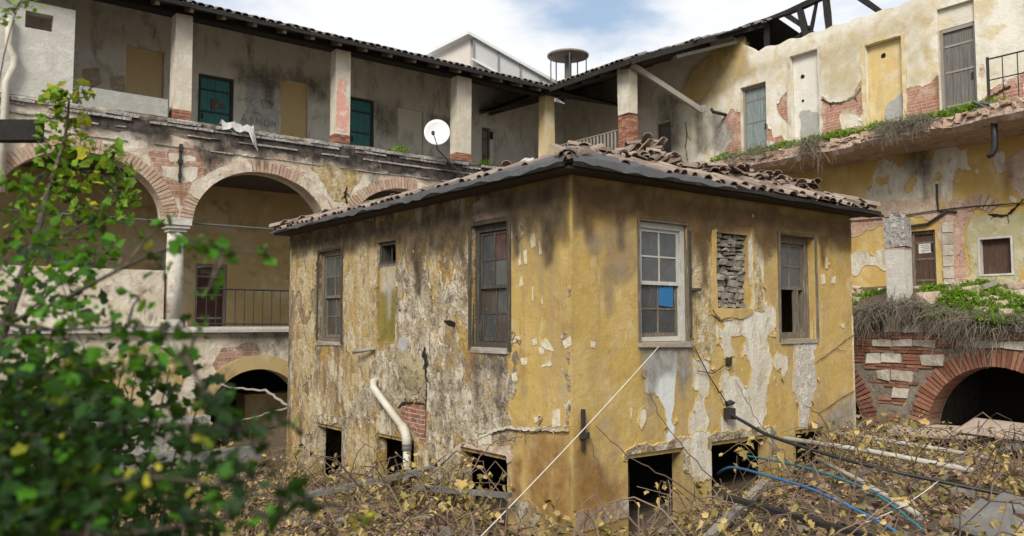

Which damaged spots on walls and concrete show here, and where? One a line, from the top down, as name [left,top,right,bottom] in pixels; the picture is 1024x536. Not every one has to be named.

flaking render [96,118,221,206]
flaking render [230,69,453,203]
water stain [290,179,852,294]
flaking render [822,79,867,135]
flaking render [906,75,940,116]
flaking render [850,146,1024,284]
water stain [380,269,396,341]
flaking render [291,230,572,487]
flaking render [622,207,820,486]